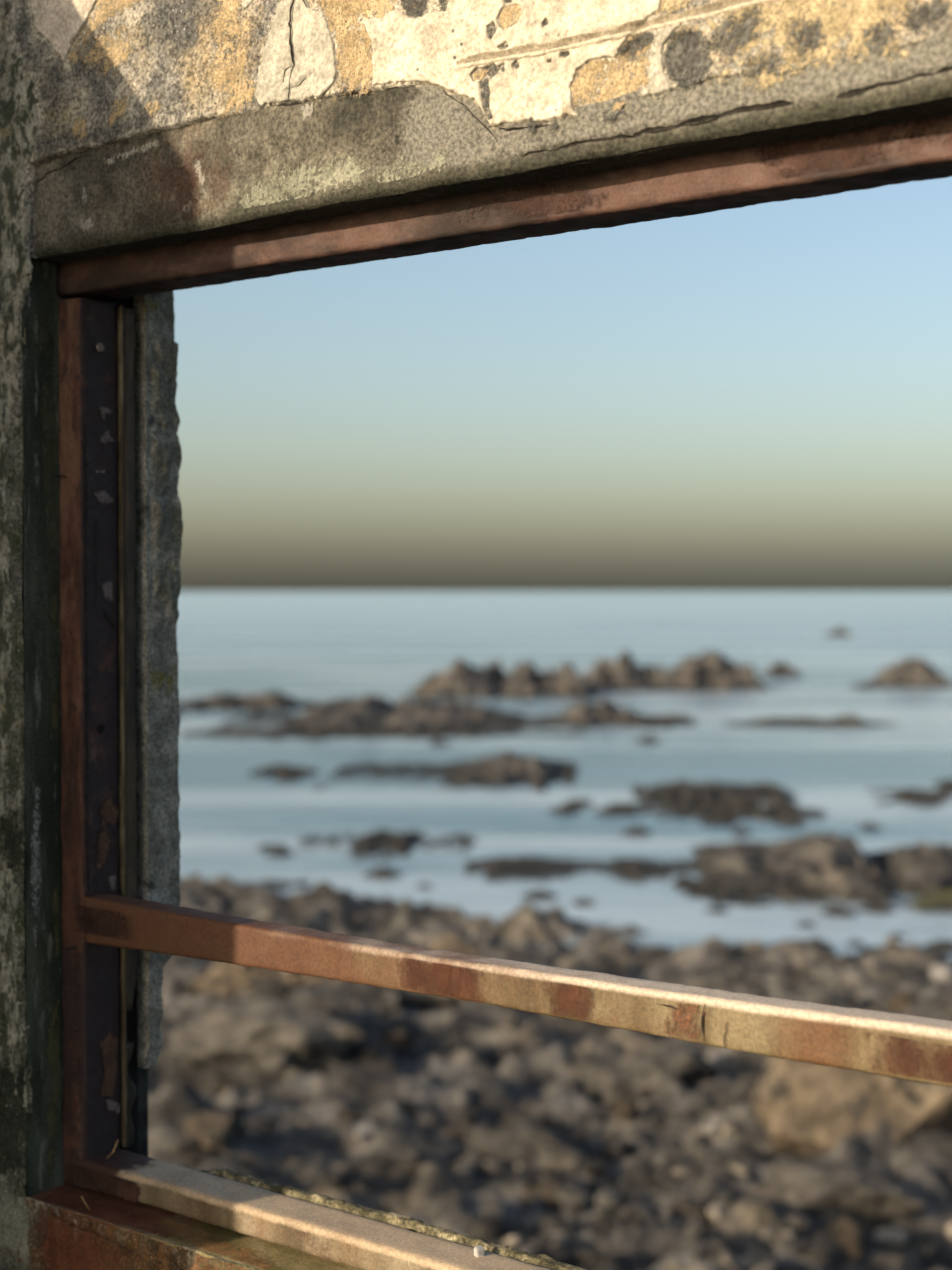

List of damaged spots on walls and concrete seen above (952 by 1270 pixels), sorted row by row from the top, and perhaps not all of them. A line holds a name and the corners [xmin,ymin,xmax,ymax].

peeling [31,0,98,63]
peeling [254,0,338,107]
crack [282,0,357,105]
peeling [364,0,780,133]
spalling [786,18,827,57]
spalling [857,0,950,51]
water stain [0,787,60,957]
rust [401,958,476,999]
rust [550,984,591,1020]
rust [876,1036,952,1084]
water stain [0,1054,34,1270]
rust [40,1163,271,1269]